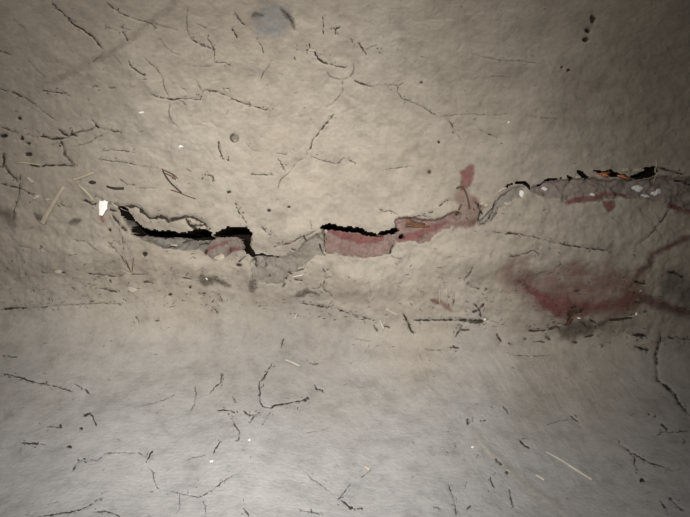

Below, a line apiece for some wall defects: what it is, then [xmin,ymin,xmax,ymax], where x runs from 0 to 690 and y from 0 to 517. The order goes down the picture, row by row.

crack [55,5,101,47]
crack [294,44,371,86]
crack [153,90,267,110]
crack [3,130,77,211]
spalling [479,167,690,226]
crack [506,166,689,190]
spalling [125,220,246,261]
crack [84,195,487,352]
spalling [251,211,460,284]
crack [633,333,688,407]
crack [212,364,323,440]
crack [44,499,120,517]